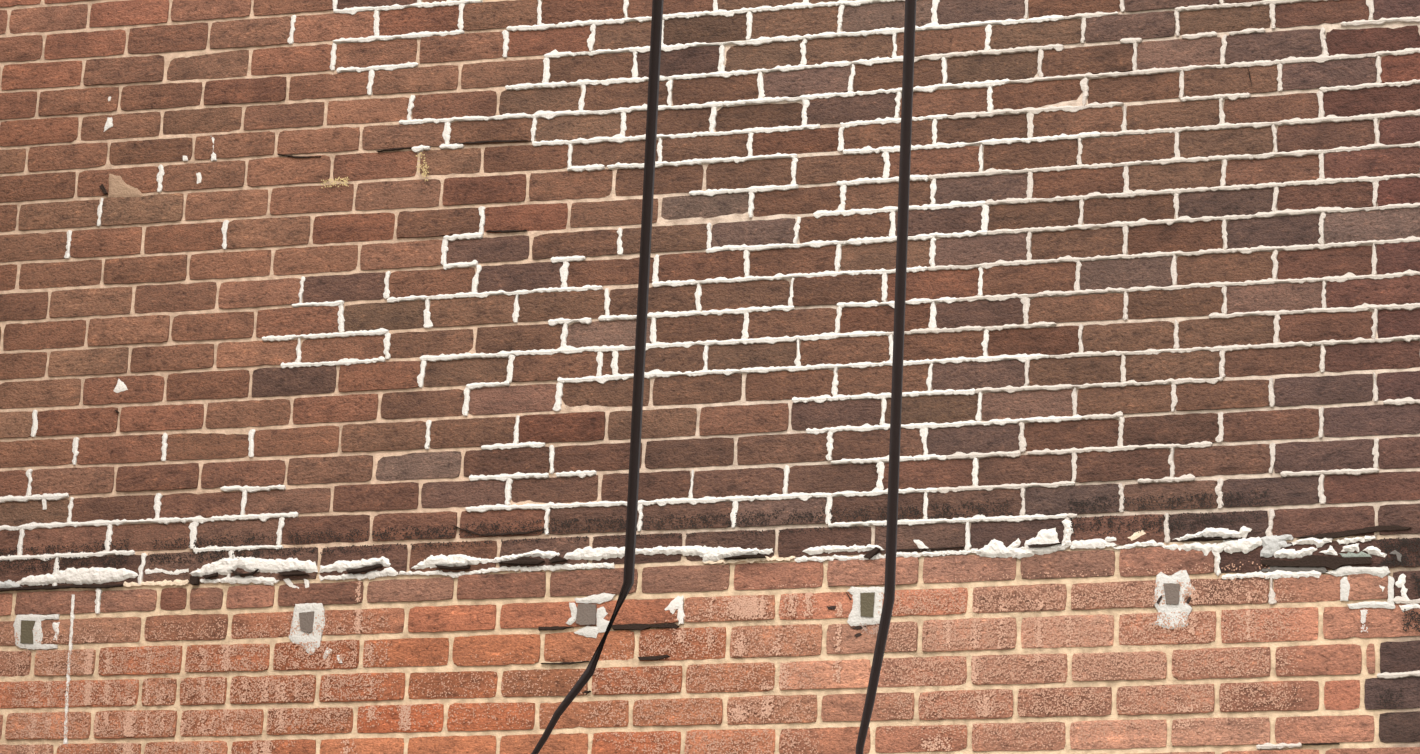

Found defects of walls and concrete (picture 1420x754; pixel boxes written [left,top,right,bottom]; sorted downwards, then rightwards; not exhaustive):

crack [435,524,568,570]
crack [1028,541,1062,549]
crack [1182,535,1238,543]
crack [1296,525,1412,562]
crack [724,553,766,561]
crack [864,546,964,559]
crack [346,564,383,573]
crack [189,569,310,585]
crack [0,584,124,592]